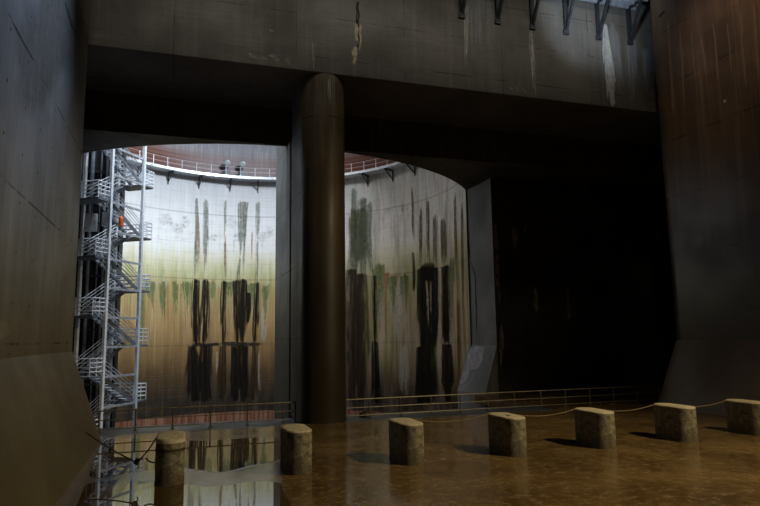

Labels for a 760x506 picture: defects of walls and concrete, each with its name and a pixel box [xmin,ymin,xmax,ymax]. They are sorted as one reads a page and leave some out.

efflorescence [602,24,616,107]
water stain [186,279,260,402]
water stain [371,276,381,404]
water stain [411,252,485,403]